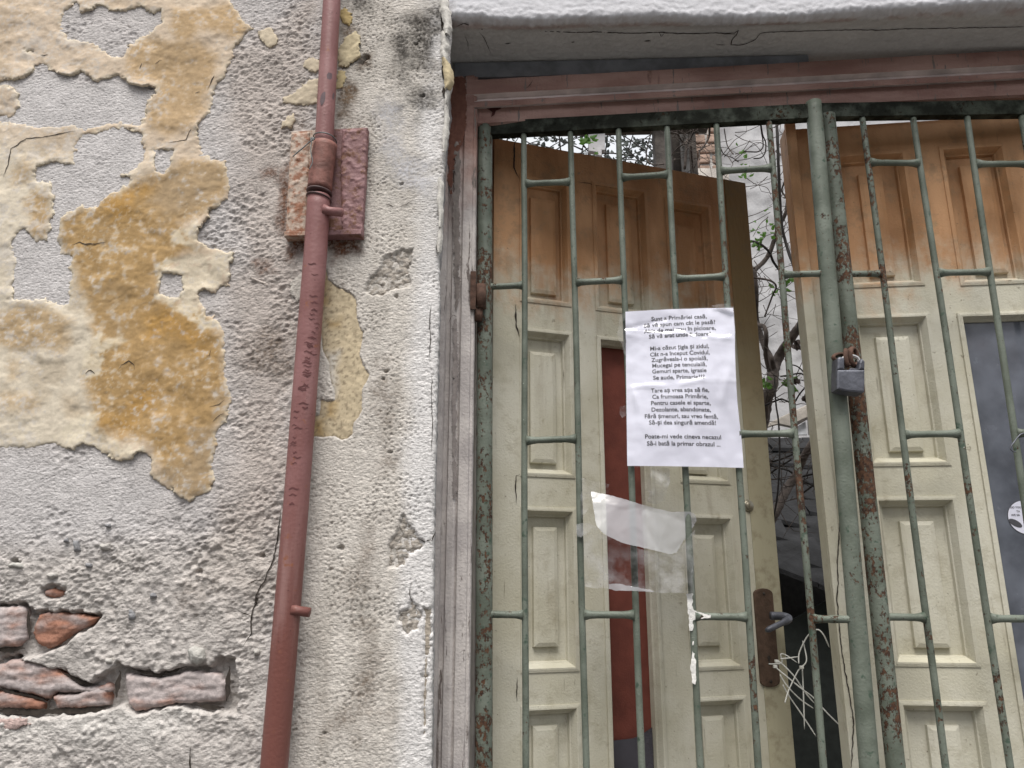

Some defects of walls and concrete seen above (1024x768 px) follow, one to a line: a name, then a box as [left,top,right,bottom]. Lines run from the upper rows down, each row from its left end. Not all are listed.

peeling [281,57,319,130]
peeling [336,7,361,89]
peeling [0,0,278,502]
spalling [314,272,369,440]
spalling [45,572,66,598]
crack [239,512,281,646]
spalling [389,518,423,567]
spalling [0,605,231,716]